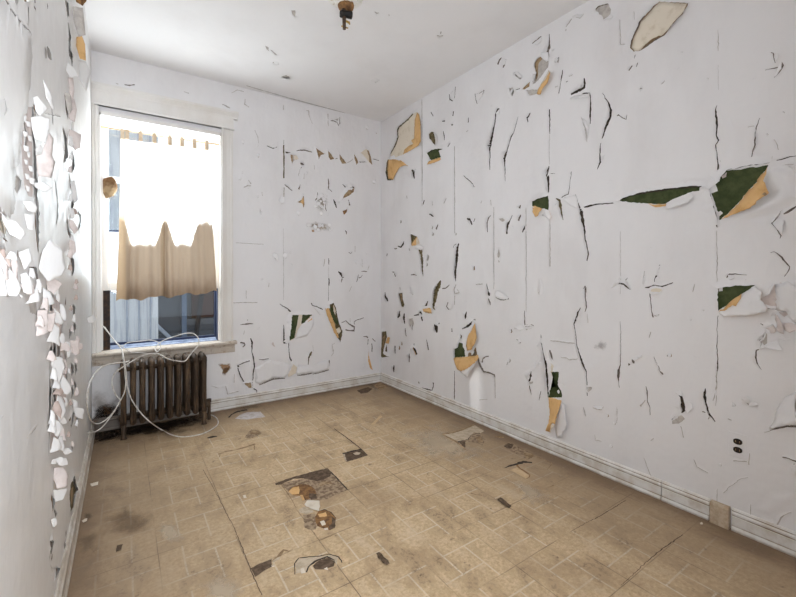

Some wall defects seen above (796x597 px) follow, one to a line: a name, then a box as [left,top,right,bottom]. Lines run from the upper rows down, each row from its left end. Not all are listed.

crack [267,99,498,402]
peeling [386,112,442,180]
crack [485,70,796,312]
peeling [620,187,700,210]
peeling [711,165,769,227]
peeling [0,81,85,581]
peeling [232,302,342,393]
crack [523,283,595,401]
crack [613,321,626,388]
crack [618,231,674,415]
crack [696,315,723,422]
peeling [717,270,796,370]